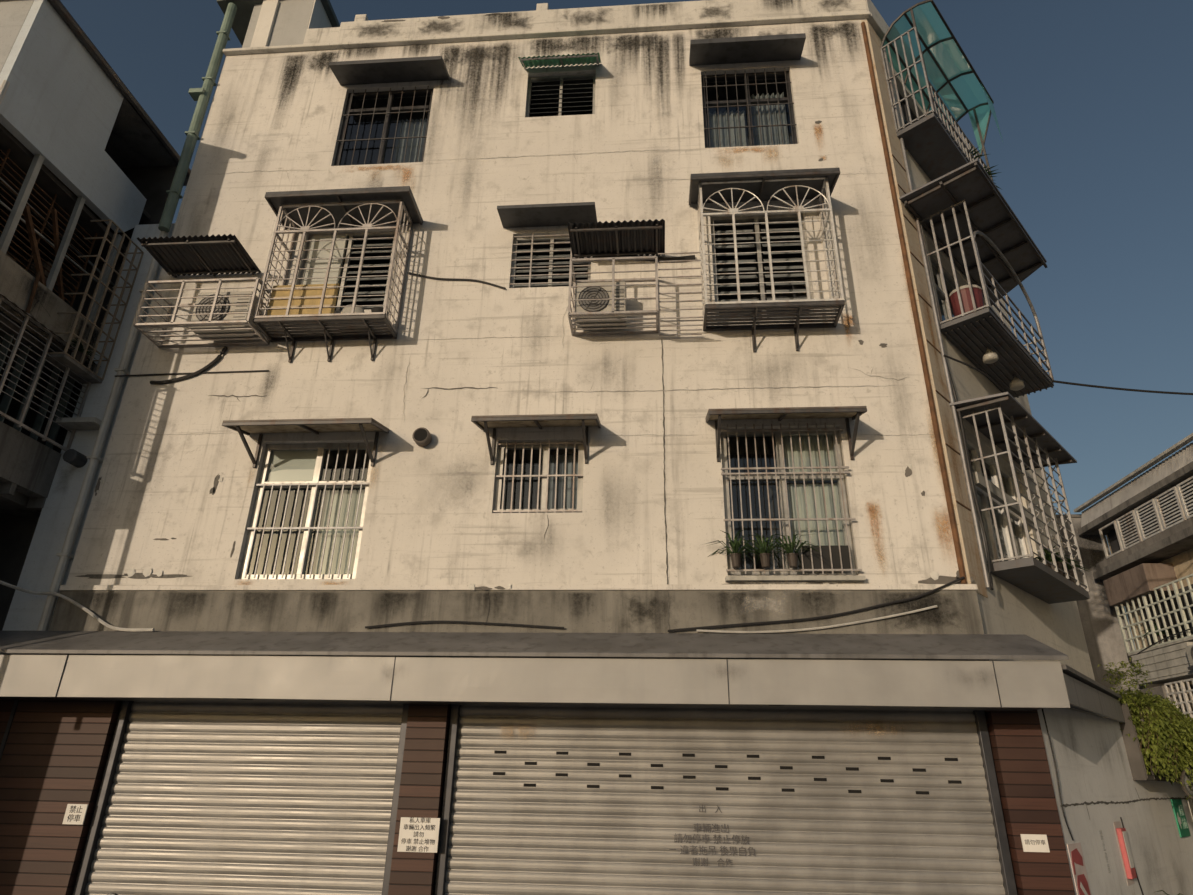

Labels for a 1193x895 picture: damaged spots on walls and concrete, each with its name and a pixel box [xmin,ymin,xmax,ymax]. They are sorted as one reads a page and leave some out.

leakage [279,26,389,106]
leakage [422,21,451,32]
leakage [441,44,511,99]
leakage [488,13,527,27]
leakage [536,37,599,54]
leakage [615,35,684,87]
leakage [812,23,856,57]
crack [403,307,568,420]
leakage [896,594,941,622]